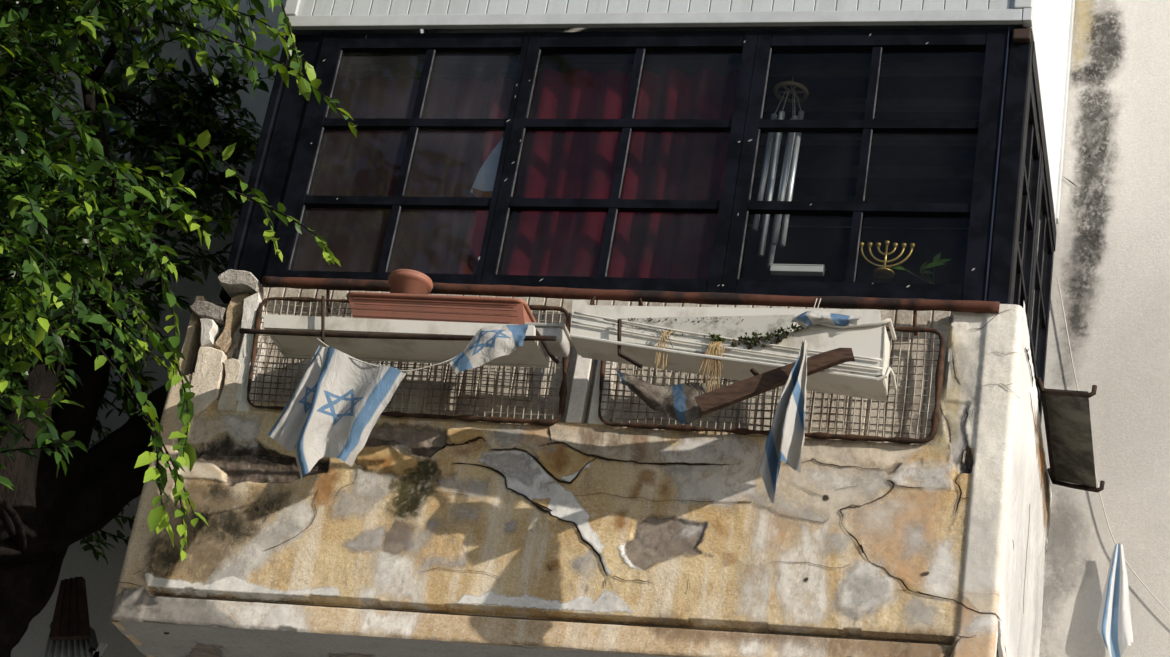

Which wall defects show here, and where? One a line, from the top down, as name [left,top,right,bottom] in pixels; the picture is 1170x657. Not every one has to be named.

water stain [1067,1,1123,352]
spalling [177,292,329,487]
water stain [149,482,284,581]
peeling [109,501,339,634]
water stain [359,460,438,638]
peeling [334,422,611,575]
peeling [457,590,633,613]
spalling [618,517,711,571]
crack [425,426,1030,654]